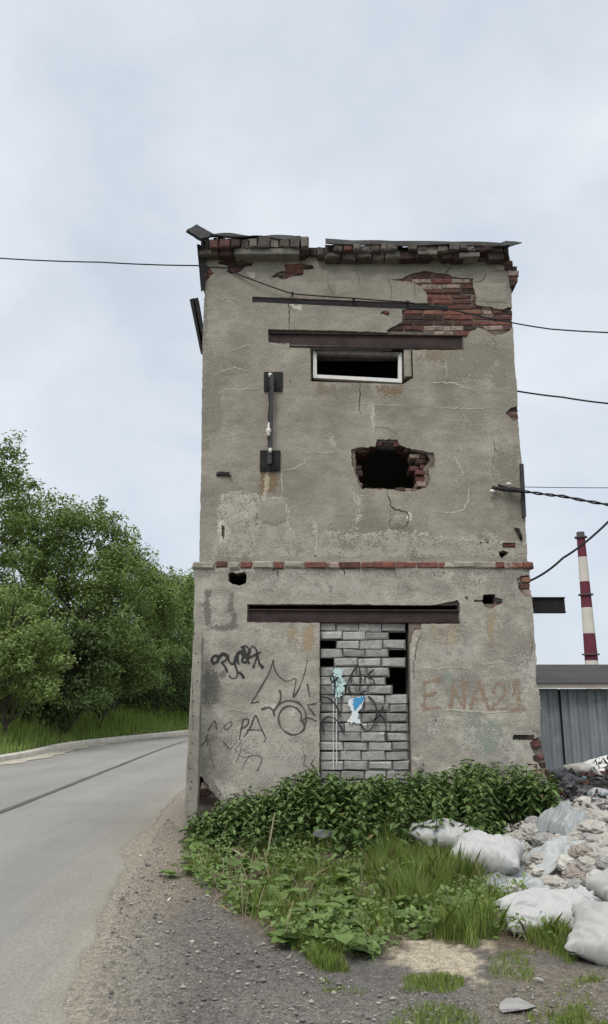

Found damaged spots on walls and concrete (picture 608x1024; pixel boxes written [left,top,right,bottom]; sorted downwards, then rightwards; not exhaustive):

spalling [273,264,313,280]
spalling [496,261,519,294]
spalling [384,271,512,336]
corrosion [258,471,280,499]
spalling [355,442,430,492]
crack [387,492,410,529]
crack [441,455,470,548]
peeling [205,490,527,600]
spalling [517,575,531,595]
peeling [496,654,549,776]
peeling [188,700,306,813]